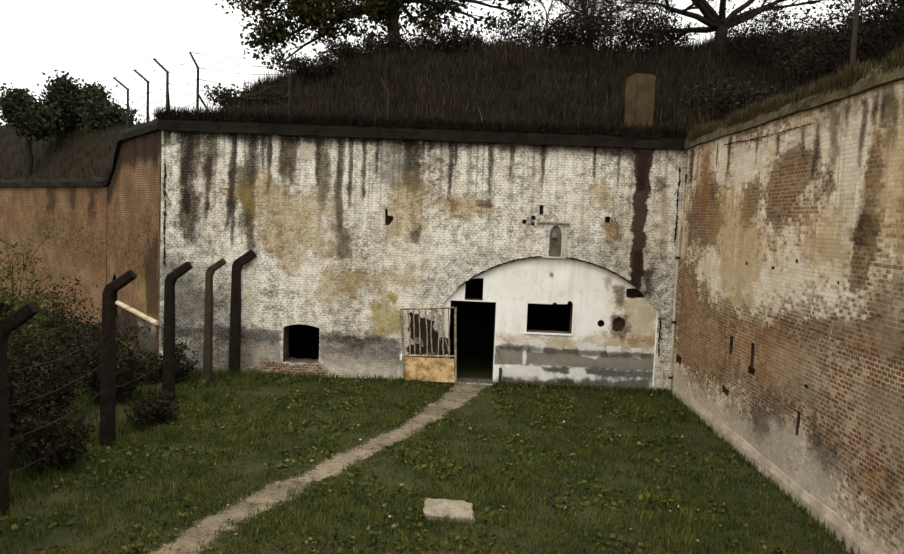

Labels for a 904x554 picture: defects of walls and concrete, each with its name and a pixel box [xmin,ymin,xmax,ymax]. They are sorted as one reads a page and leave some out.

damp [315,139,379,230]
damp [403,142,423,194]
damp [447,143,458,198]
damp [801,123,819,178]
damp [830,106,849,162]
damp [858,90,897,164]
damp [616,148,656,304]
peeling [501,338,642,383]
spalling [597,317,625,332]
peeling [674,121,904,550]